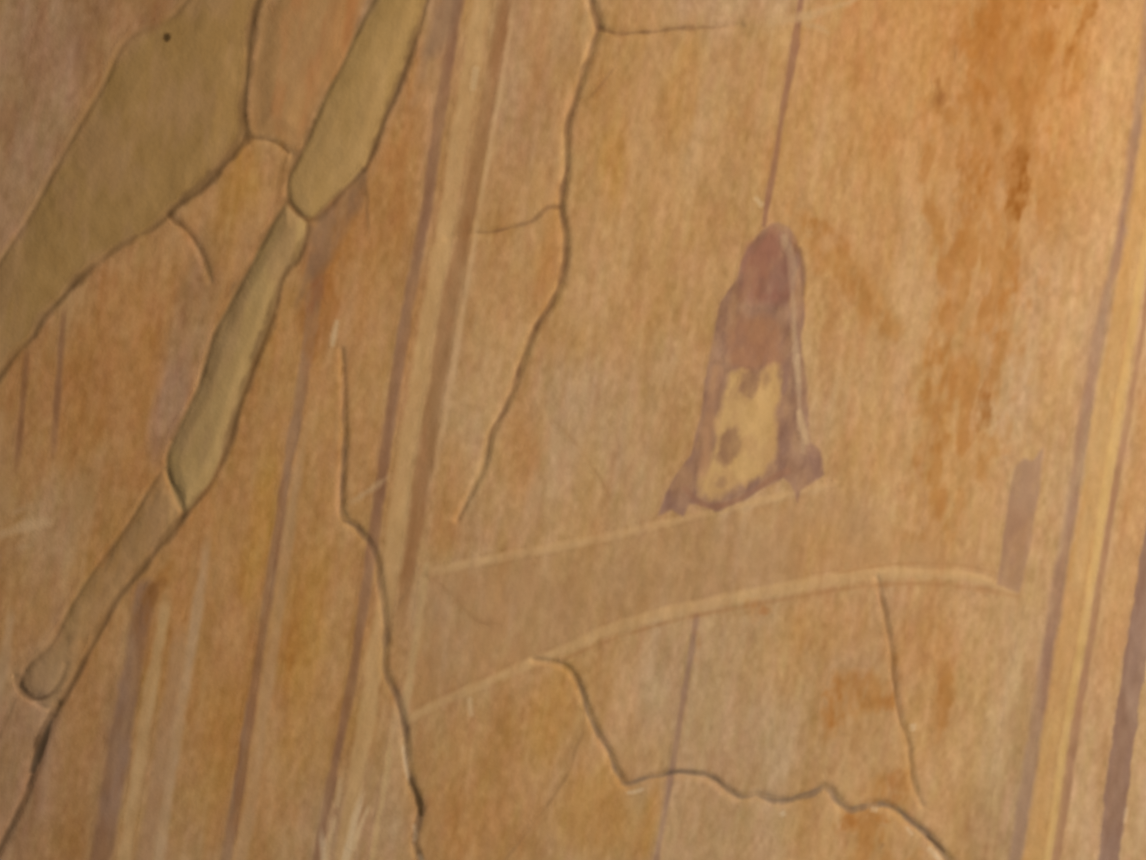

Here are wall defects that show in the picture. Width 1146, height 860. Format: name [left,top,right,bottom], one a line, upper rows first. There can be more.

crack [0,0,428,860]
crack [458,0,732,498]
crack [500,582,954,860]